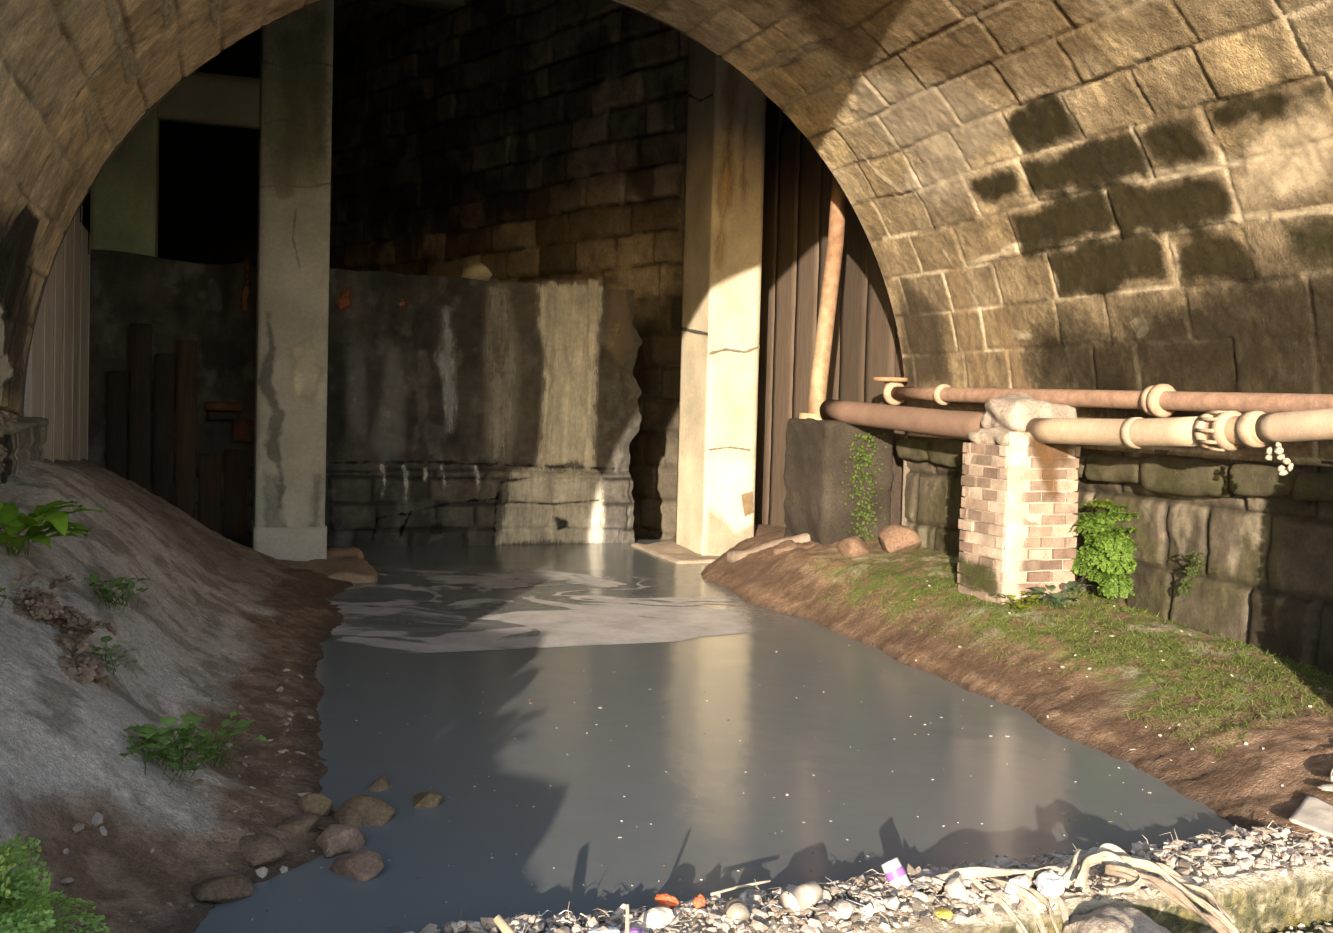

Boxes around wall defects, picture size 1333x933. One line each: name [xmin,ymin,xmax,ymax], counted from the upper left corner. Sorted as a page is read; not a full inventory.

damp [0,434,19,484]
damp [0,204,40,403]
damp [435,308,457,433]
damp [485,279,605,545]
damp [902,283,947,387]
damp [942,242,1023,388]
damp [1004,434,1025,595]
damp [1046,225,1183,296]
damp [1104,408,1158,418]
damp [1018,124,1250,195]
damp [997,269,1333,394]
damp [1204,207,1333,226]